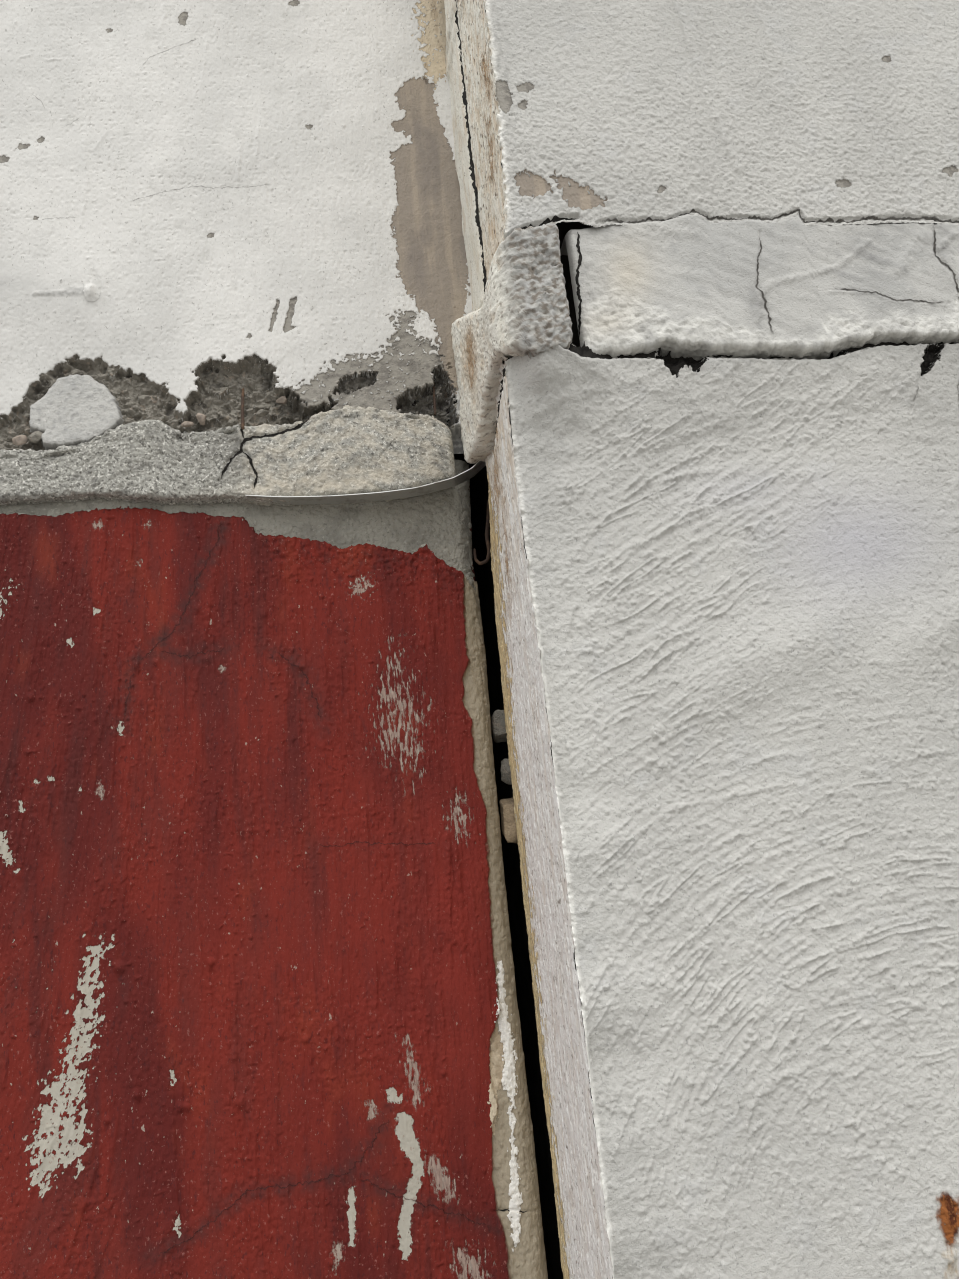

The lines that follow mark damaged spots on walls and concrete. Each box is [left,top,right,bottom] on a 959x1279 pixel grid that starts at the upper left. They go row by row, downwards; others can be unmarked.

crack [455,0,487,294]
peeling [0,0,471,451]
crack [521,209,959,365]
peeling [0,459,476,590]
crack [221,418,310,488]
peeling [349,572,375,598]
peeling [372,637,436,795]
peeling [22,933,115,1198]
peeling [332,1186,357,1275]
peeling [364,1034,459,1260]
corrosion [937,1193,959,1245]